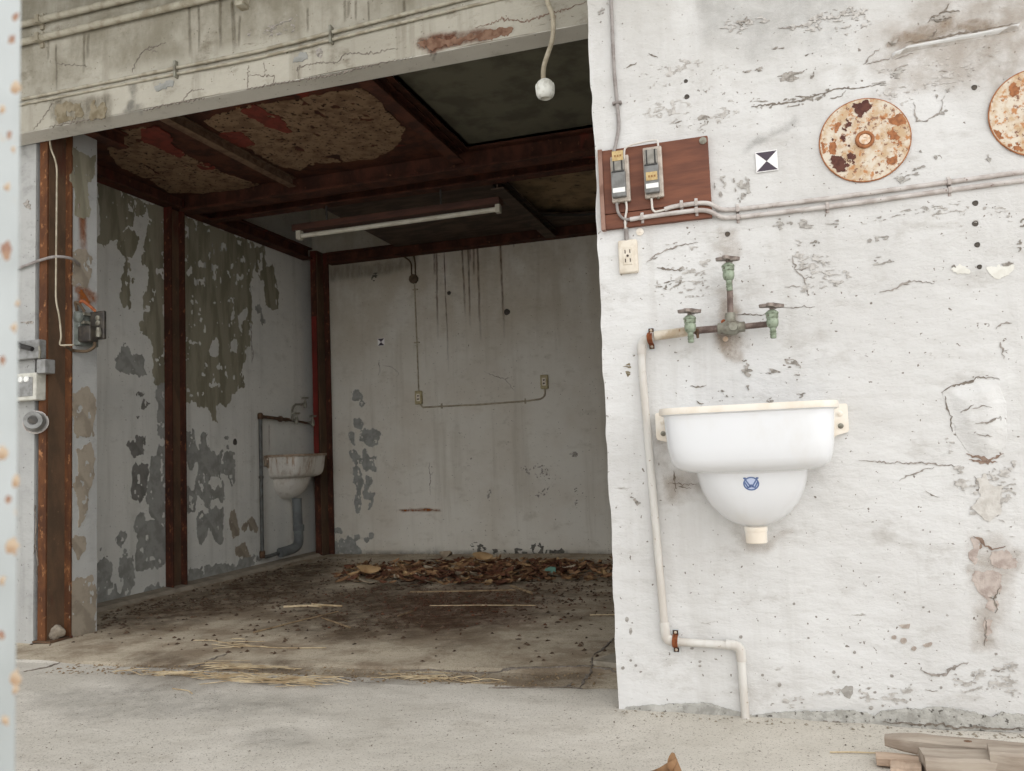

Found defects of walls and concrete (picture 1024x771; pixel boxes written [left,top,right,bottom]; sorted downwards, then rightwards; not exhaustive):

corrosion [419,30,482,53]
crack [751,4,1018,107]
peeling [204,88,406,171]
spalling [863,201,1024,279]
peeling [185,216,279,423]
peeling [69,126,262,637]
peeling [348,389,381,514]
crack [859,322,1011,497]
spalling [470,542,527,554]
spalling [968,537,1018,642]
crack [400,638,616,689]